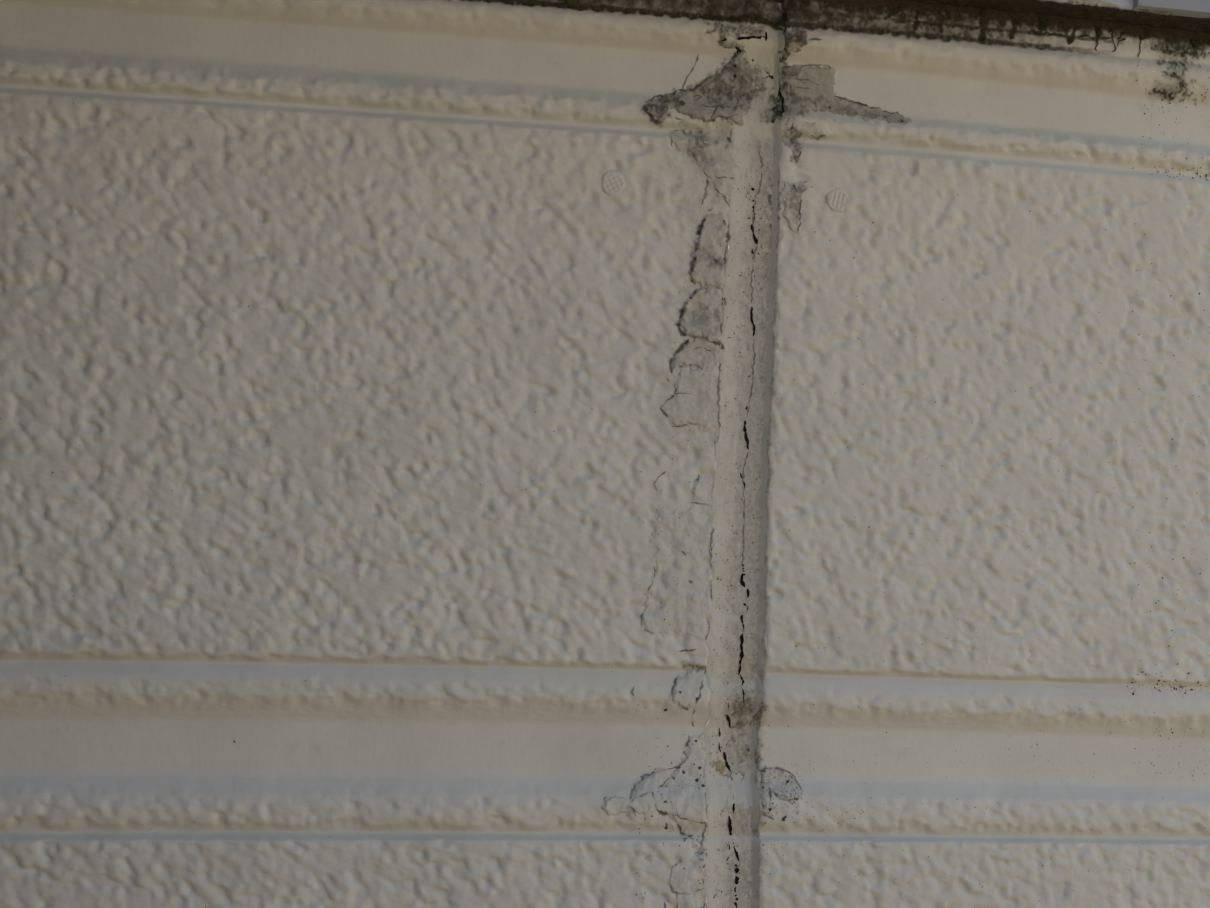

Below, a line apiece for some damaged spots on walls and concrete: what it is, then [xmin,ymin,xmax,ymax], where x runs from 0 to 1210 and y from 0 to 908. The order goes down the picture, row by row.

damp [462,0,1210,145]
peeling [643,474,716,640]
crack [718,152,763,908]
peeling [667,852,706,908]